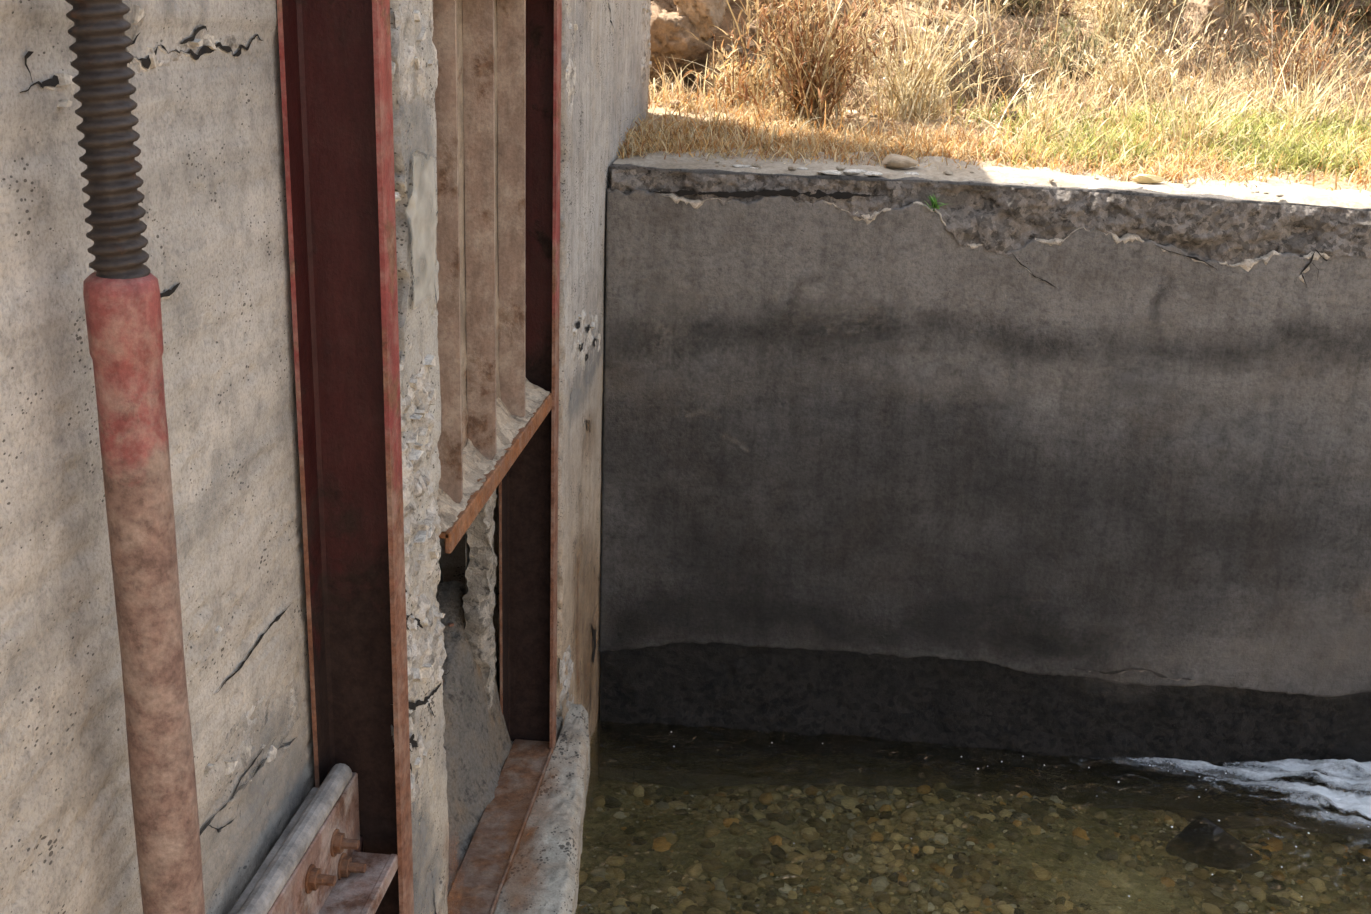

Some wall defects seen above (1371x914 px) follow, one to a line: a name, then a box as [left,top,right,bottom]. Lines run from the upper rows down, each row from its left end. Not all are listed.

crack [19,51,59,93]
crack [129,25,263,71]
spalling [391,0,438,108]
spalling [611,165,1371,272]
crack [160,283,180,299]
spalling [571,308,601,372]
crack [214,602,292,694]
crack [200,737,296,835]